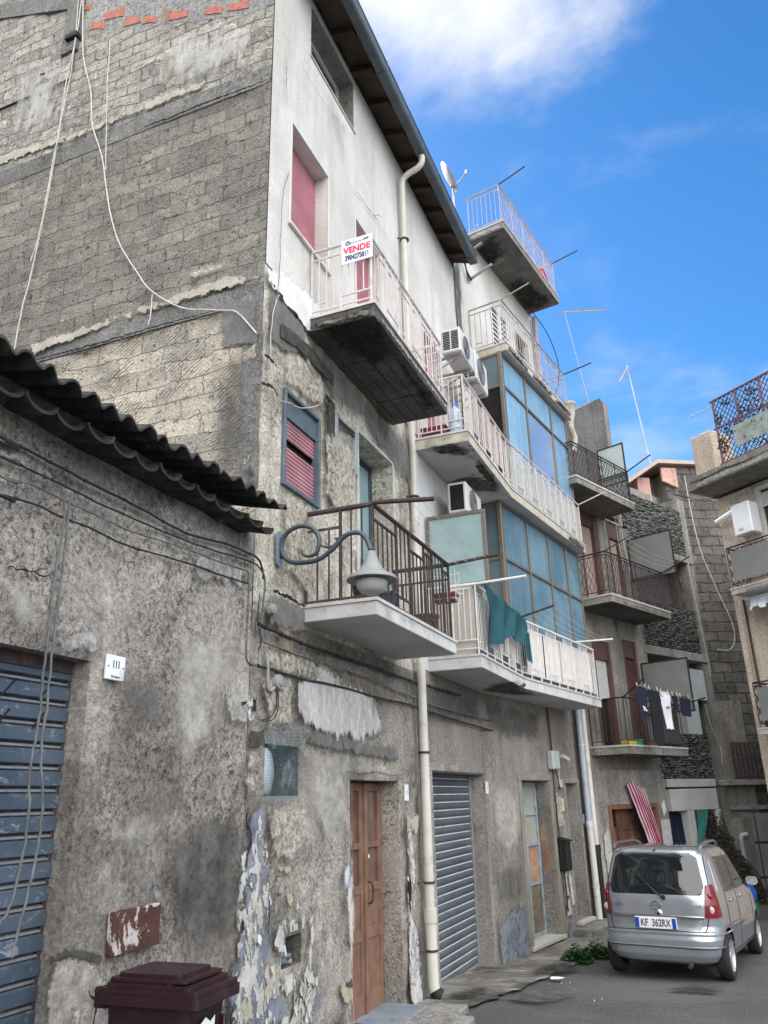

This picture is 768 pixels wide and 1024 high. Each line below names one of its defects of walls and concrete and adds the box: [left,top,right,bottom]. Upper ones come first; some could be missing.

water stain [478,236,504,264]
water stain [510,280,548,309]
water stain [172,810,242,943]
peeling [230,804,323,1024]
peeling [405,814,423,1004]